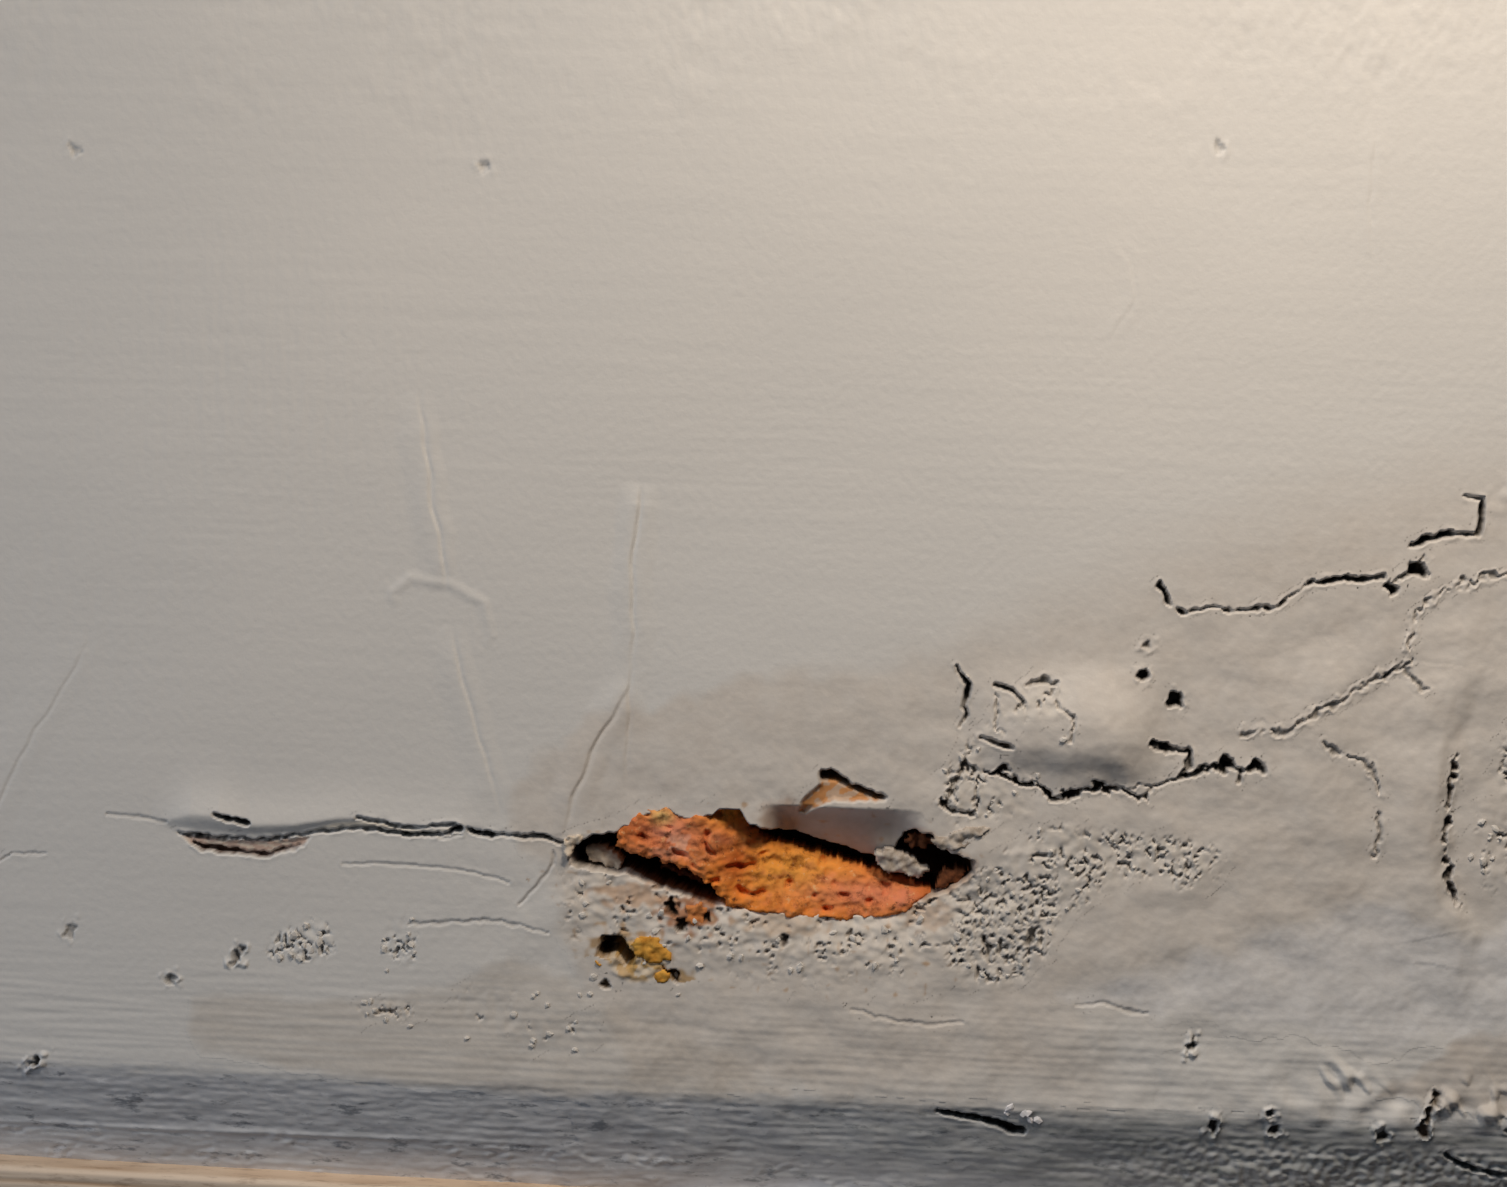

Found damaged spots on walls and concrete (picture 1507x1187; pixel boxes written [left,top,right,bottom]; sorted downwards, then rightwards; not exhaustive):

crack [100,807,562,939]
damp [185,410,1507,1119]
spalling [521,762,1236,1006]
crack [931,489,1507,866]
crack [1435,750,1468,914]